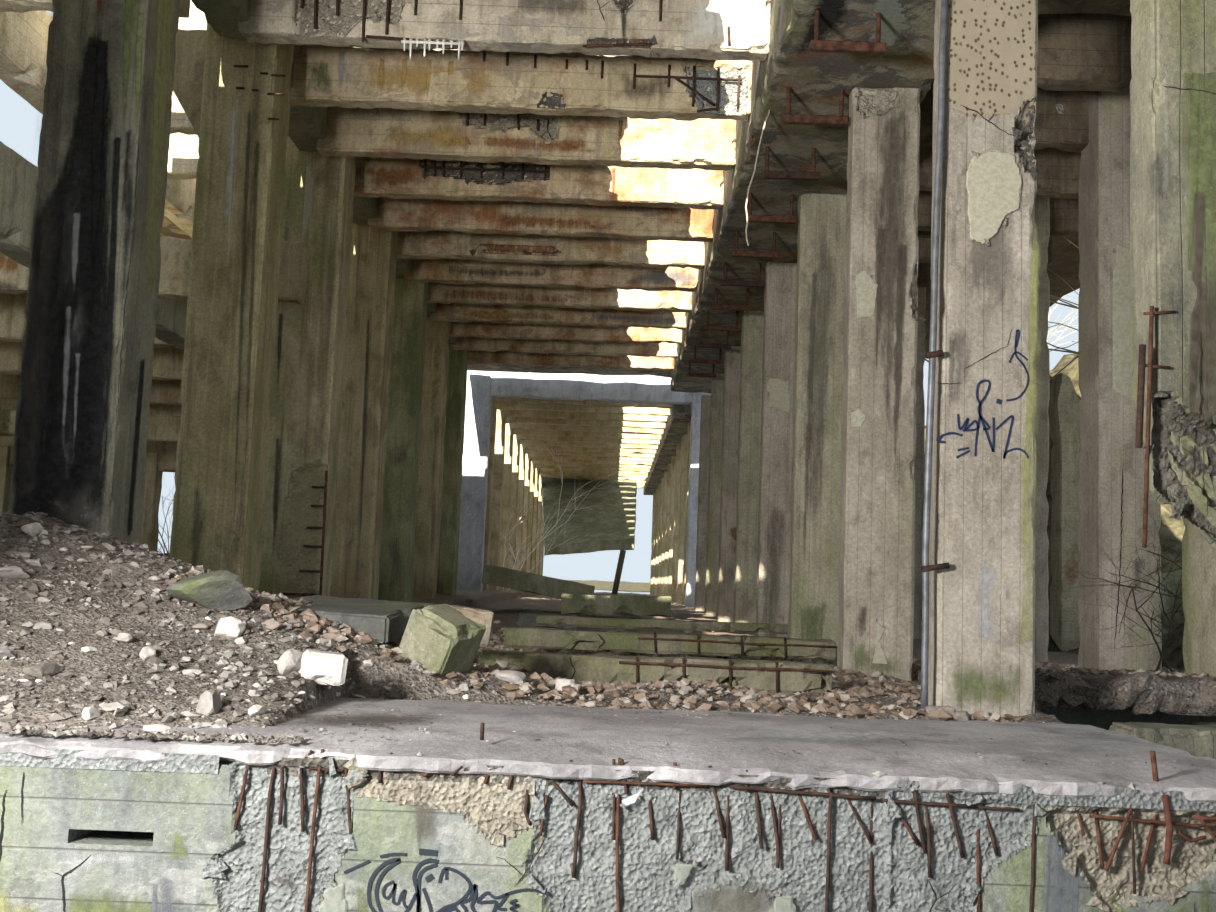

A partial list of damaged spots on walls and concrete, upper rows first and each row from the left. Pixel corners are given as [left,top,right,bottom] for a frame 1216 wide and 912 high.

spalling [583,35,658,79]
spalling [633,63,750,116]
peeling [948,0,1038,247]
damp [31,41,121,477]
damp [1187,73,1216,476]
spalling [1113,244,1216,548]
crack [0,771,24,854]
crack [56,855,91,912]
spalling [0,744,1216,912]
crack [929,881,958,912]